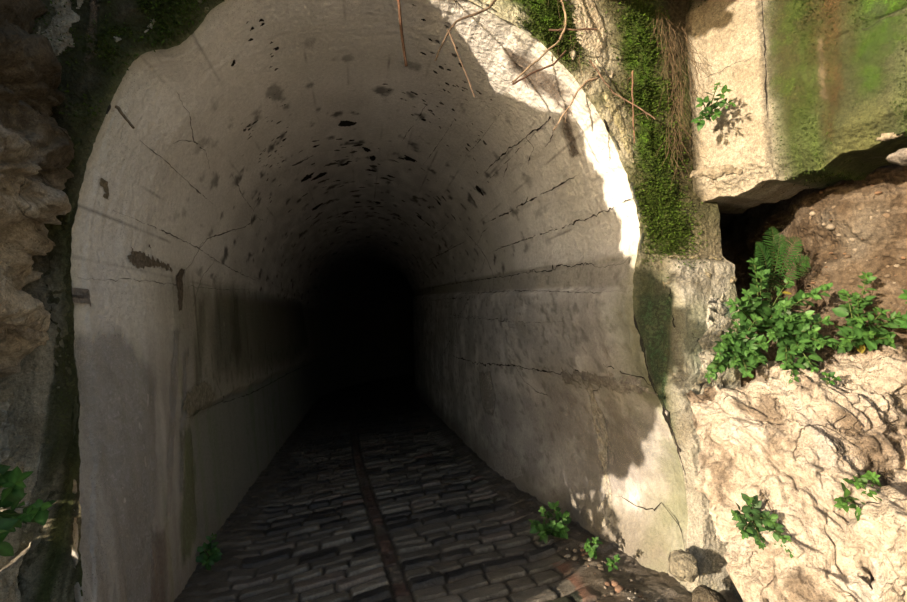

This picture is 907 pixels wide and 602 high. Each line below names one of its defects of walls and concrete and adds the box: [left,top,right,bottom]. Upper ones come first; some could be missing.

crack [485,106,558,181]
peeling [127,245,185,311]
crack [73,175,268,306]
crack [429,175,634,324]
crack [451,355,578,398]
crack [603,316,685,472]